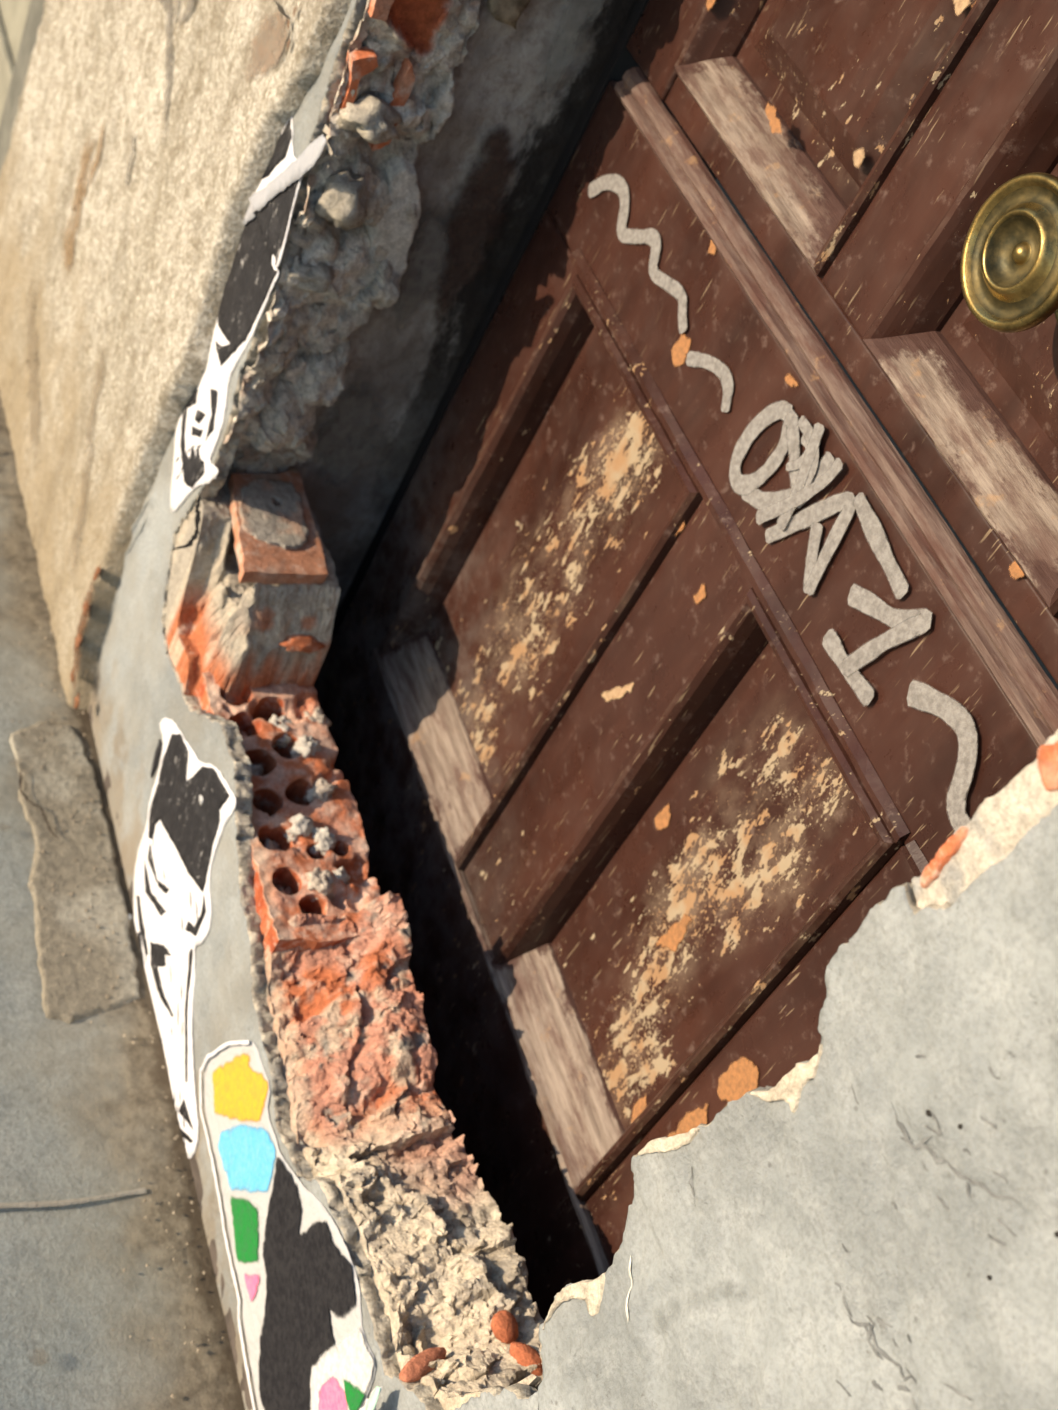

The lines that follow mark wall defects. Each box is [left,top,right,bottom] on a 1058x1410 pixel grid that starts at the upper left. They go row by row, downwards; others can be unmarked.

peeling [954,0,977,16]
peeling [765,103,782,134]
peeling [853,148,864,167]
peeling [671,332,691,367]
peeling [694,584,706,604]
spalling [164,0,605,1410]
peeling [601,682,634,702]
peeling [655,805,671,830]
spalling [911,730,1058,909]
peeling [656,913,692,952]
peeling [631,1096,646,1123]
spalling [638,1044,823,1155]